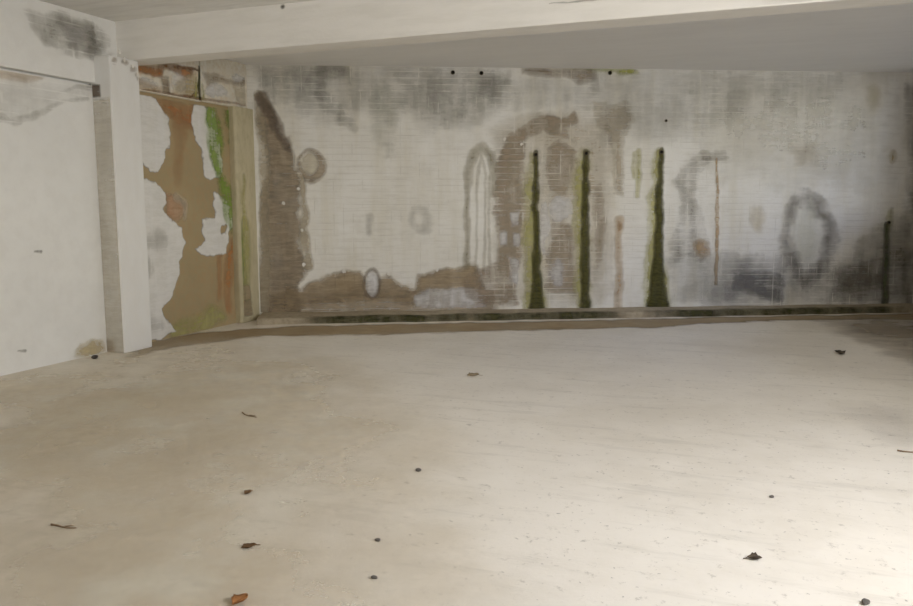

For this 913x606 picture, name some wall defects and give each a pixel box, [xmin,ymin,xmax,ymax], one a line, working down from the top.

peeling [140,95,186,340]
peeling [191,105,223,180]
peeling [196,192,232,256]
peeling [255,91,577,312]